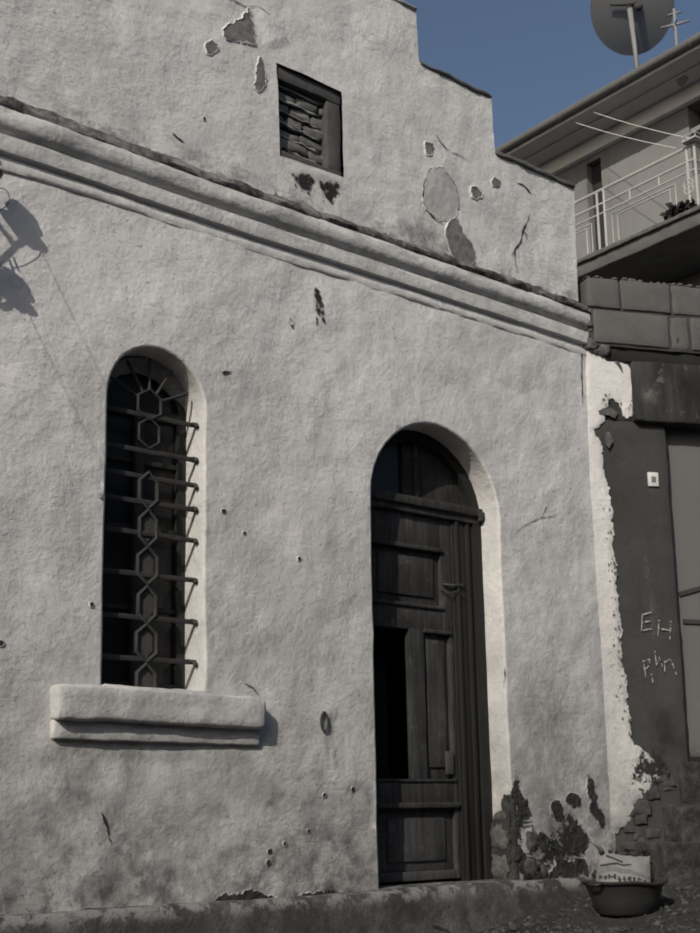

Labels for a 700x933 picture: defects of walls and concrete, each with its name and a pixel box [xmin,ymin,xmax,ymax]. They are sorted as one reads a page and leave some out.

peeling [203,7,267,93]
peeling [422,141,476,265]
peeling [469,185,483,201]
crack [511,182,530,268]
spalling [490,774,605,880]
spalling [214,888,279,901]